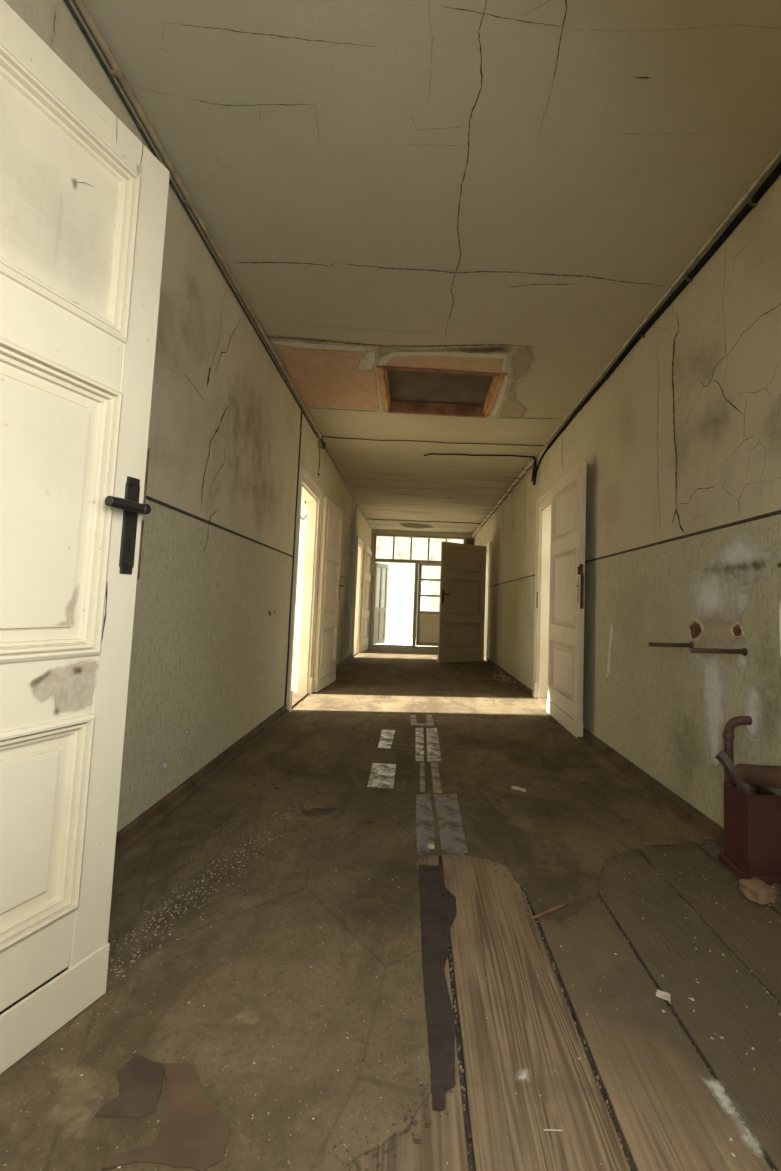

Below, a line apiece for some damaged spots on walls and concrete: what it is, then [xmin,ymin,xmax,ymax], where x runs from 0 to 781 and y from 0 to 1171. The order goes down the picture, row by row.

crack [161,22,373,49]
crack [135,86,319,140]
crack [236,0,781,533]
flaking render [278,346,379,409]
flaking render [387,356,502,371]
crack [167,292,241,550]
leakage [693,540,769,618]
peeling [30,662,97,712]
leakage [745,689,759,737]